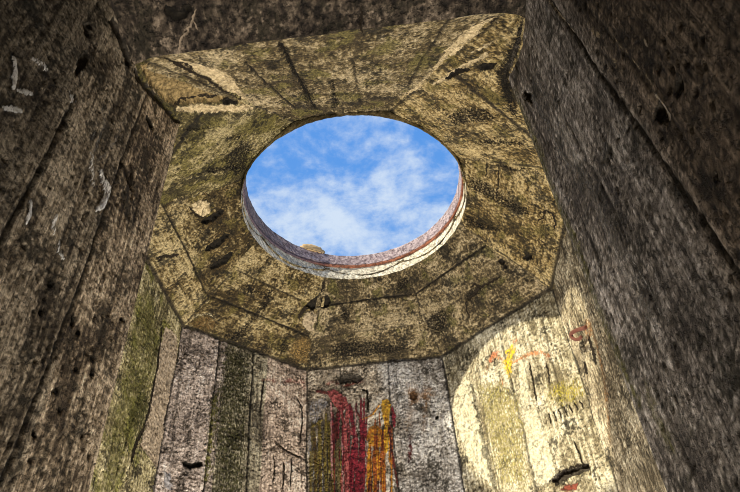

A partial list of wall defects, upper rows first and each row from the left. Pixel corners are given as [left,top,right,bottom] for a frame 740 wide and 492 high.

peeling [404,16,523,120]
spalling [298,281,331,331]
damp [99,287,160,492]
damp [169,284,275,492]
peeling [518,358,590,491]